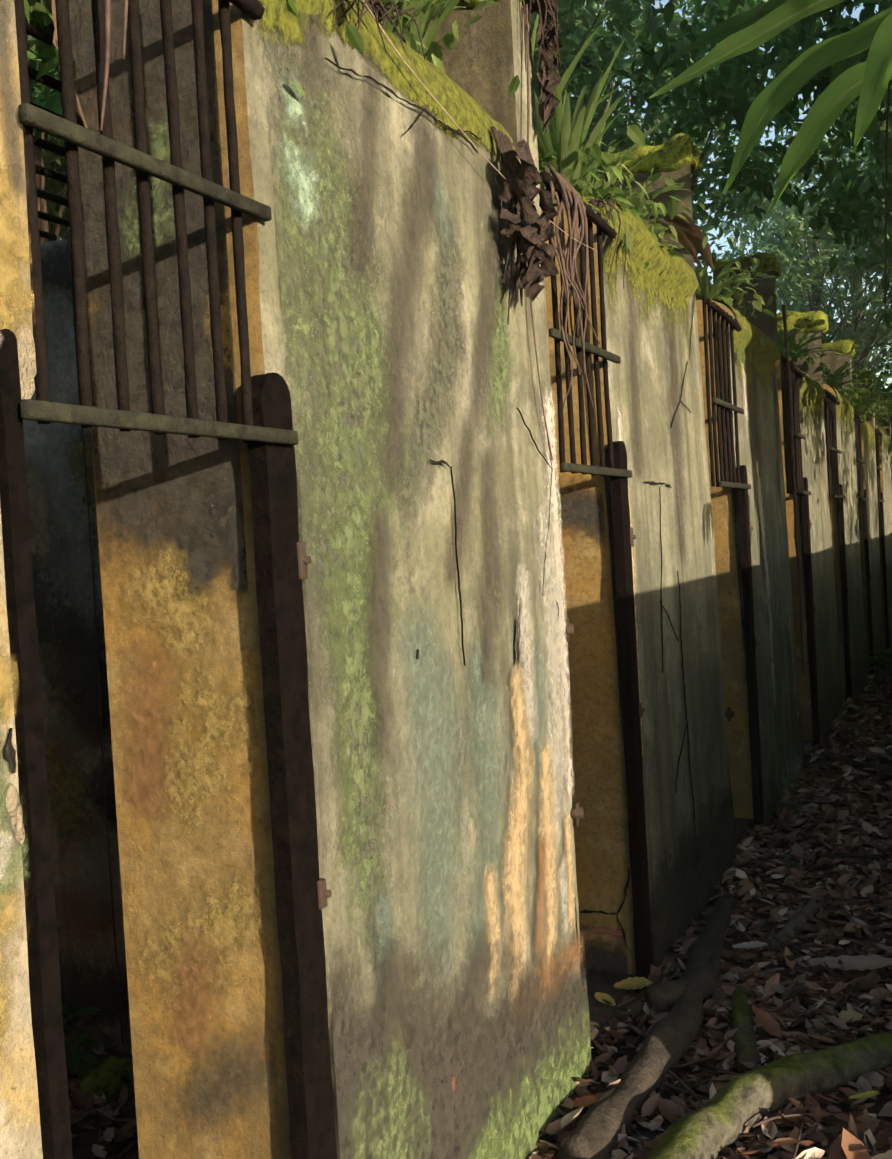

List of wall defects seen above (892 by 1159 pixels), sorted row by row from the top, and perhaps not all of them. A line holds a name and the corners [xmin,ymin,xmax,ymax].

crack [429,459,466,666]
water stain [277,65,628,1159]
crack [574,867,630,951]